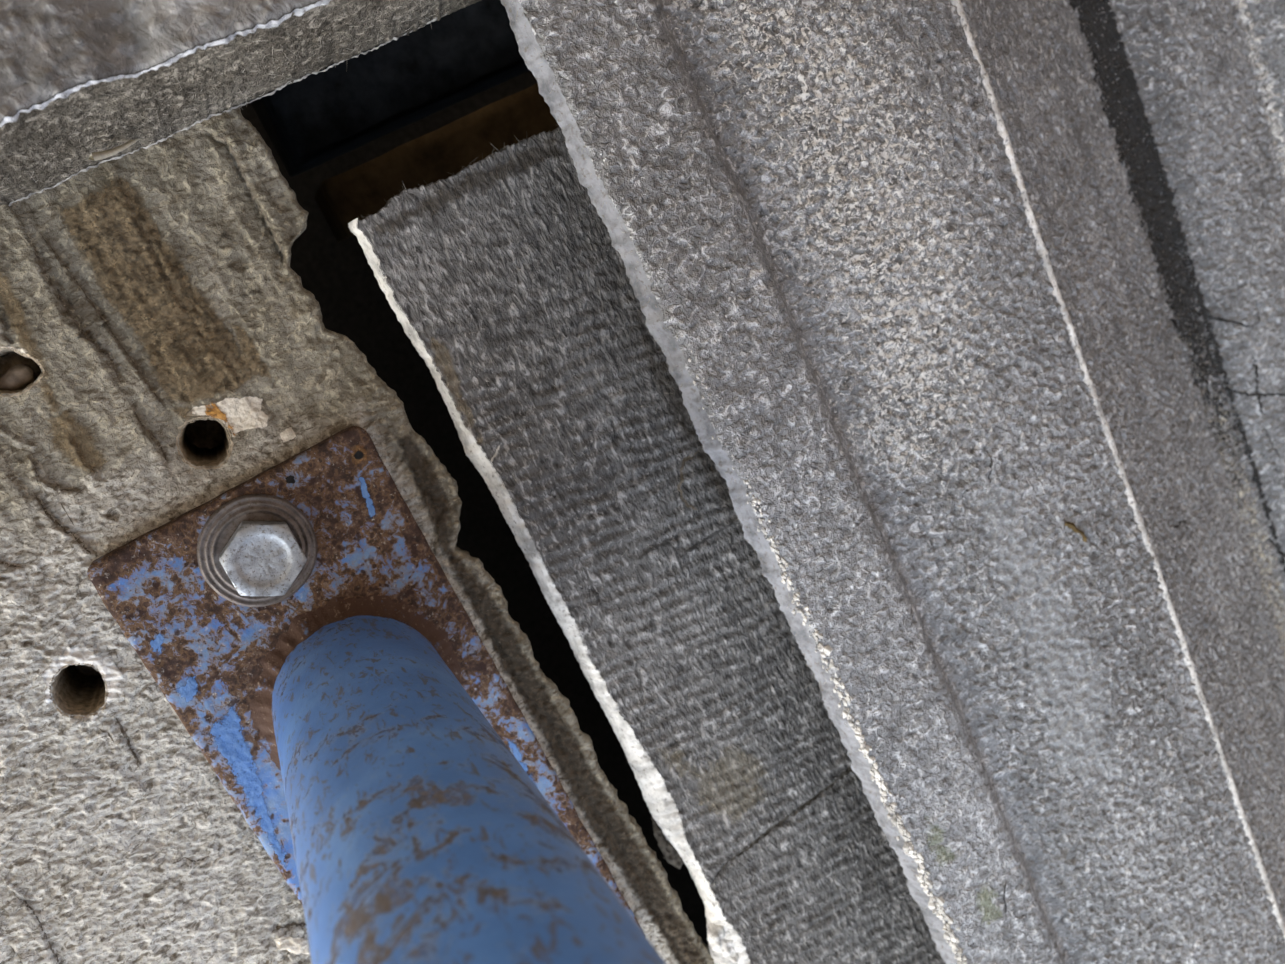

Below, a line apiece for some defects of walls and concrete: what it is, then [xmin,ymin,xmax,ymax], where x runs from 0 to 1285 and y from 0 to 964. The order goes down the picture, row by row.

crack [33,231,169,463]
damp [61,180,270,419]
spalling [191,396,296,442]
crack [32,443,95,556]
crack [6,885,61,964]